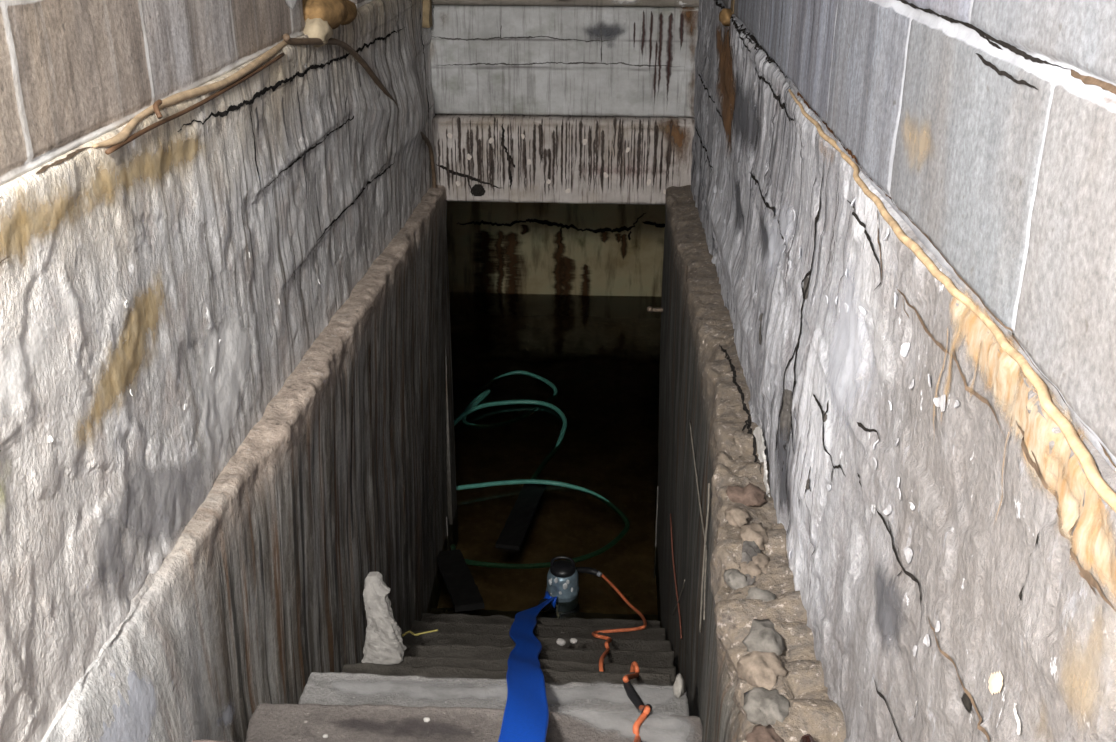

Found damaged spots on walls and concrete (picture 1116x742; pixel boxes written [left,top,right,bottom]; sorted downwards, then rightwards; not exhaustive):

damp [297,91,322,287]
corrosion [660,120,689,156]
corrosion [716,24,735,151]
damp [97,258,254,586]
crack [714,0,1116,742]